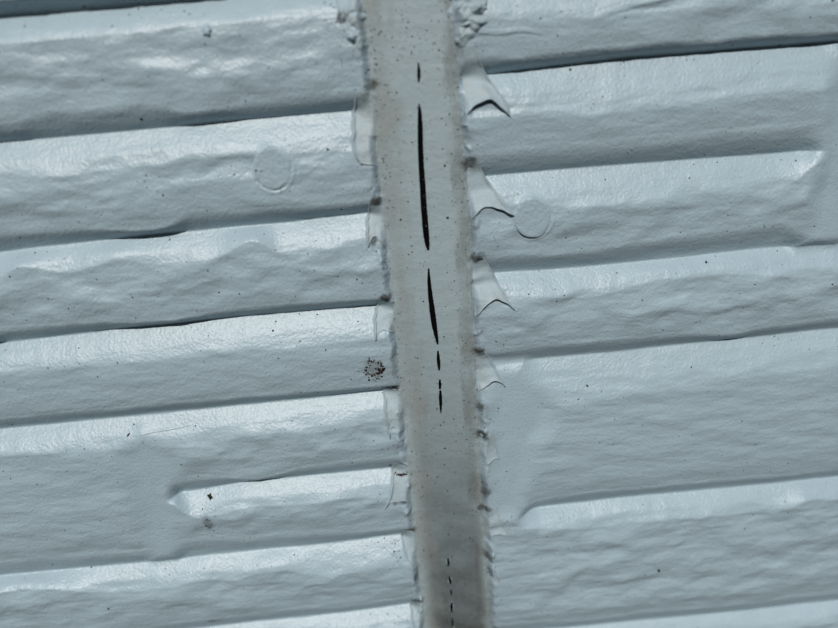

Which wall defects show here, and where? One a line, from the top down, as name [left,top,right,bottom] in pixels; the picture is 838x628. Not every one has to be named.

crack [415,63,423,82]
peeling [459,42,512,118]
peeling [350,89,377,165]
peeling [466,158,515,219]
peeling [365,205,386,248]
crack [417,104,443,426]
peeling [472,256,516,316]
peeling [372,302,395,341]
peeling [475,351,506,390]
peeling [383,388,405,440]
peeling [383,463,411,510]
crack [446,558,454,627]